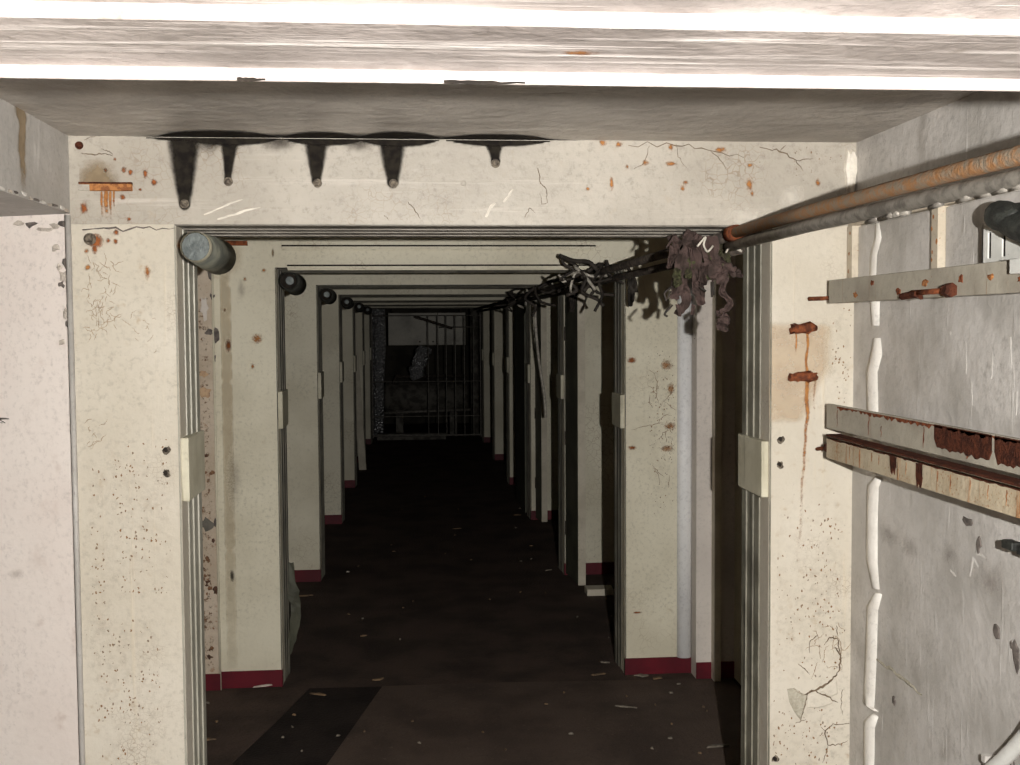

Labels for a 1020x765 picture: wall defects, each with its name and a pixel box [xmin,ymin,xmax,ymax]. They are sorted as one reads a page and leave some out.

leakage [16,107,26,175]
crack [628,141,805,169]
rust [100,191,125,212]
crack [82,225,173,233]
crack [83,253,156,353]
peeling [199,294,219,495]
rust [788,323,818,483]
rust [827,438,1020,503]
rust [837,407,1020,469]
peeling [202,507,218,665]
spalling [787,679,838,720]
crack [795,623,851,759]